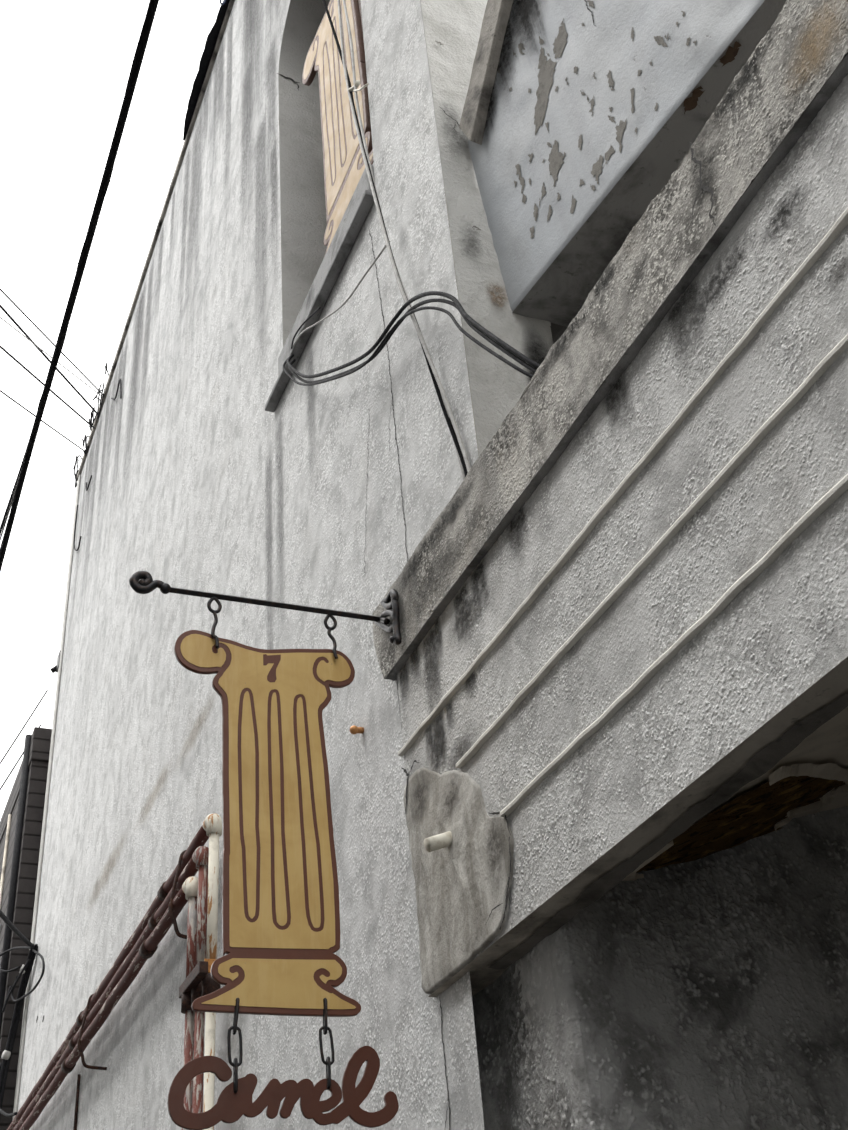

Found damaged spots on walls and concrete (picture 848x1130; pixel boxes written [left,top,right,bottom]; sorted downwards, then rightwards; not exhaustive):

peeling [654,11,685,47]
spalling [720,41,741,66]
peeling [514,18,652,238]
spalling [683,86,704,114]
damp [668,247,742,348]
damp [606,379,626,421]
damp [401,494,462,602]
damp [454,561,486,633]
damp [400,620,441,697]
damp [425,703,469,768]
spalling [488,693,848,969]
crack [439,997,450,1130]